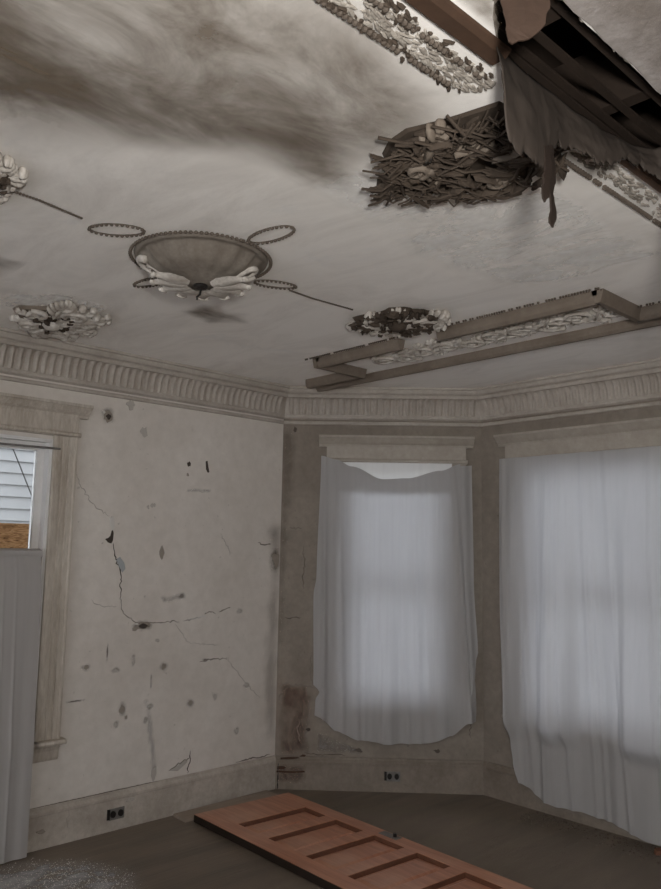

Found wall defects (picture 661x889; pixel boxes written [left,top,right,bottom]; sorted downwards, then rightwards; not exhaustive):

damp [0,0,342,149]
damp [325,45,404,135]
crack [76,472,260,698]